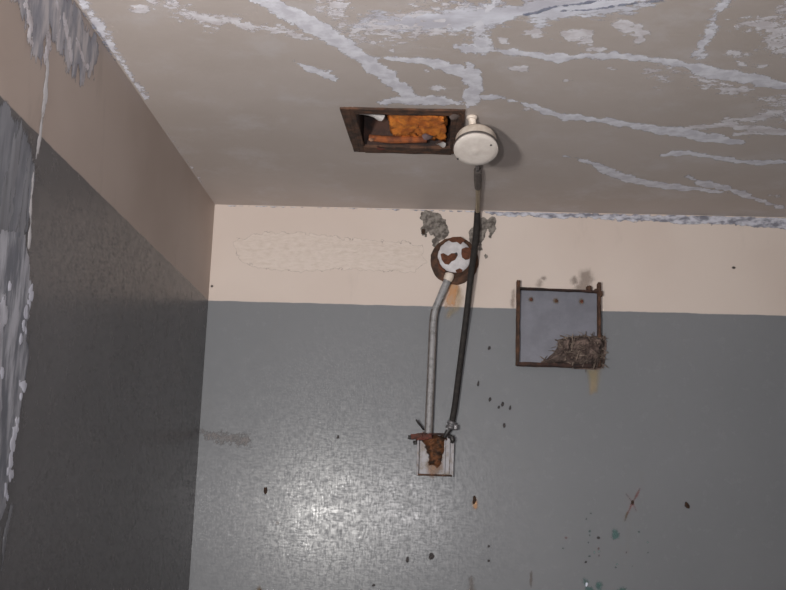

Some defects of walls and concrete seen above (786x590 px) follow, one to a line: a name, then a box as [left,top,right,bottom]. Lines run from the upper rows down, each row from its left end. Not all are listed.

peeling [11,0,150,100]
peeling [128,0,220,34]
peeling [297,63,339,82]
peeling [313,0,663,56]
peeling [690,0,786,60]
rust [387,115,448,142]
peeling [415,210,786,259]
peeling [0,230,34,572]